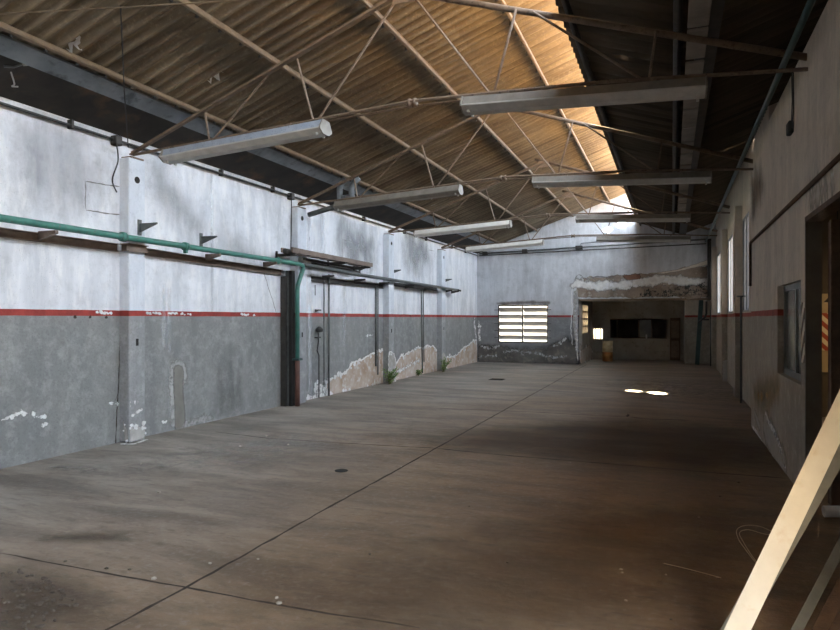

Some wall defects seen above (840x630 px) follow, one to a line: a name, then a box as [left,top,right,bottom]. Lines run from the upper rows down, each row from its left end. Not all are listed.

flaking render [571,260,707,359]
flaking render [306,318,481,400]
peeling [1,409,48,428]
peeling [122,400,146,443]